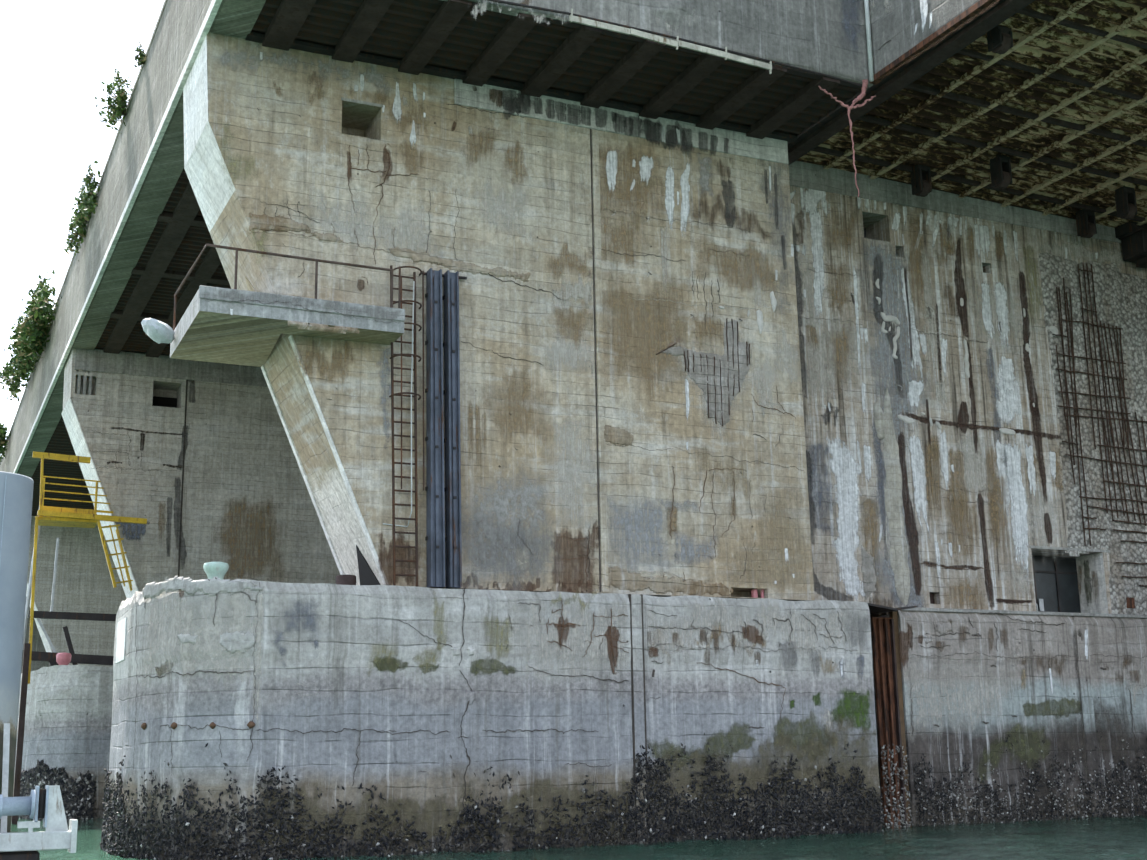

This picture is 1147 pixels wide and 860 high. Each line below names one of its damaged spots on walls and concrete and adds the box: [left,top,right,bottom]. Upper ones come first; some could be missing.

leakage [516,94,566,121]
crack [243,144,459,277]
spalling [656,318,751,432]
crack [607,386,803,579]
leakage [581,106,1120,609]
spalling [1038,252,1147,615]
crack [133,577,598,808]
rust [554,617,575,646]
rust [605,626,620,674]
crack [505,572,858,729]
rust [700,625,763,662]
leakage [1022,629,1088,777]